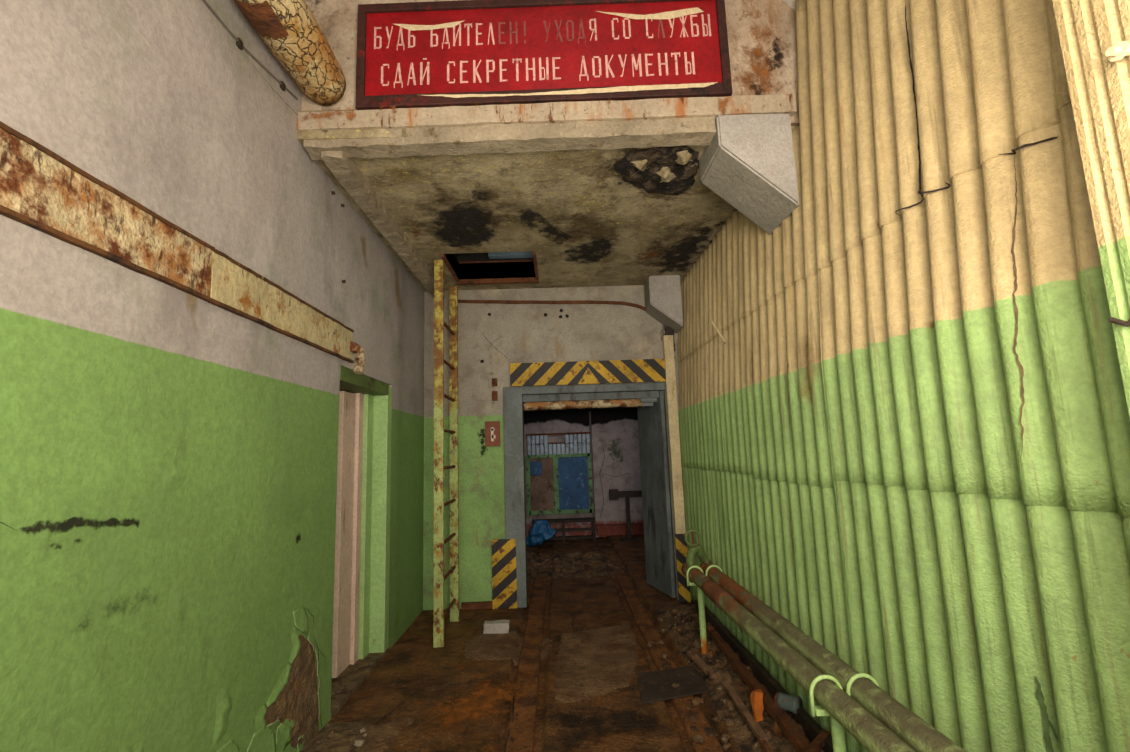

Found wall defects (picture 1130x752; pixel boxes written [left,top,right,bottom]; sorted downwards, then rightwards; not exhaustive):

corrosion [305,110,355,120]
damp [418,150,686,265]
spalling [613,145,699,196]
damp [641,219,724,273]
corrosion [736,14,779,93]
crack [895,2,950,219]
crack [998,136,1058,469]
peeling [247,607,321,752]